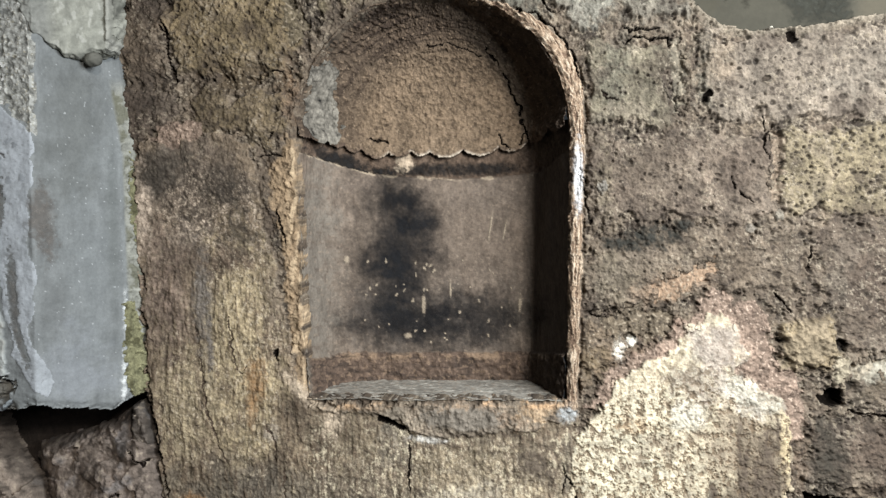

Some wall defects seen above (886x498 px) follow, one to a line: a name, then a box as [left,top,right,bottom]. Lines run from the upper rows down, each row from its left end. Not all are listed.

peeling [0,0,55,411]
leakage [388,188,420,209]
flaking render [132,119,805,498]
crack [127,440,170,496]
crack [405,427,413,491]